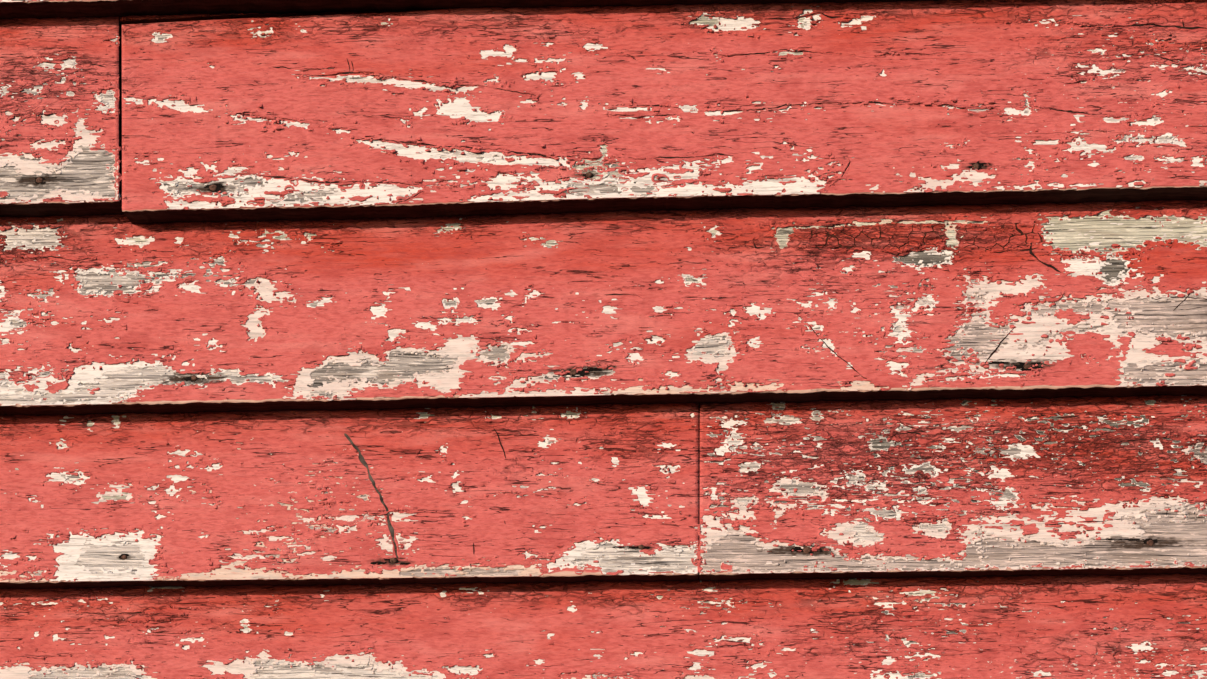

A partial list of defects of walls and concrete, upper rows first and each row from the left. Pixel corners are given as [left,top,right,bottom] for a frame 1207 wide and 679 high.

peeling [860,14,1207,192]
crack [343,432,402,561]
peeling [0,203,1207,679]